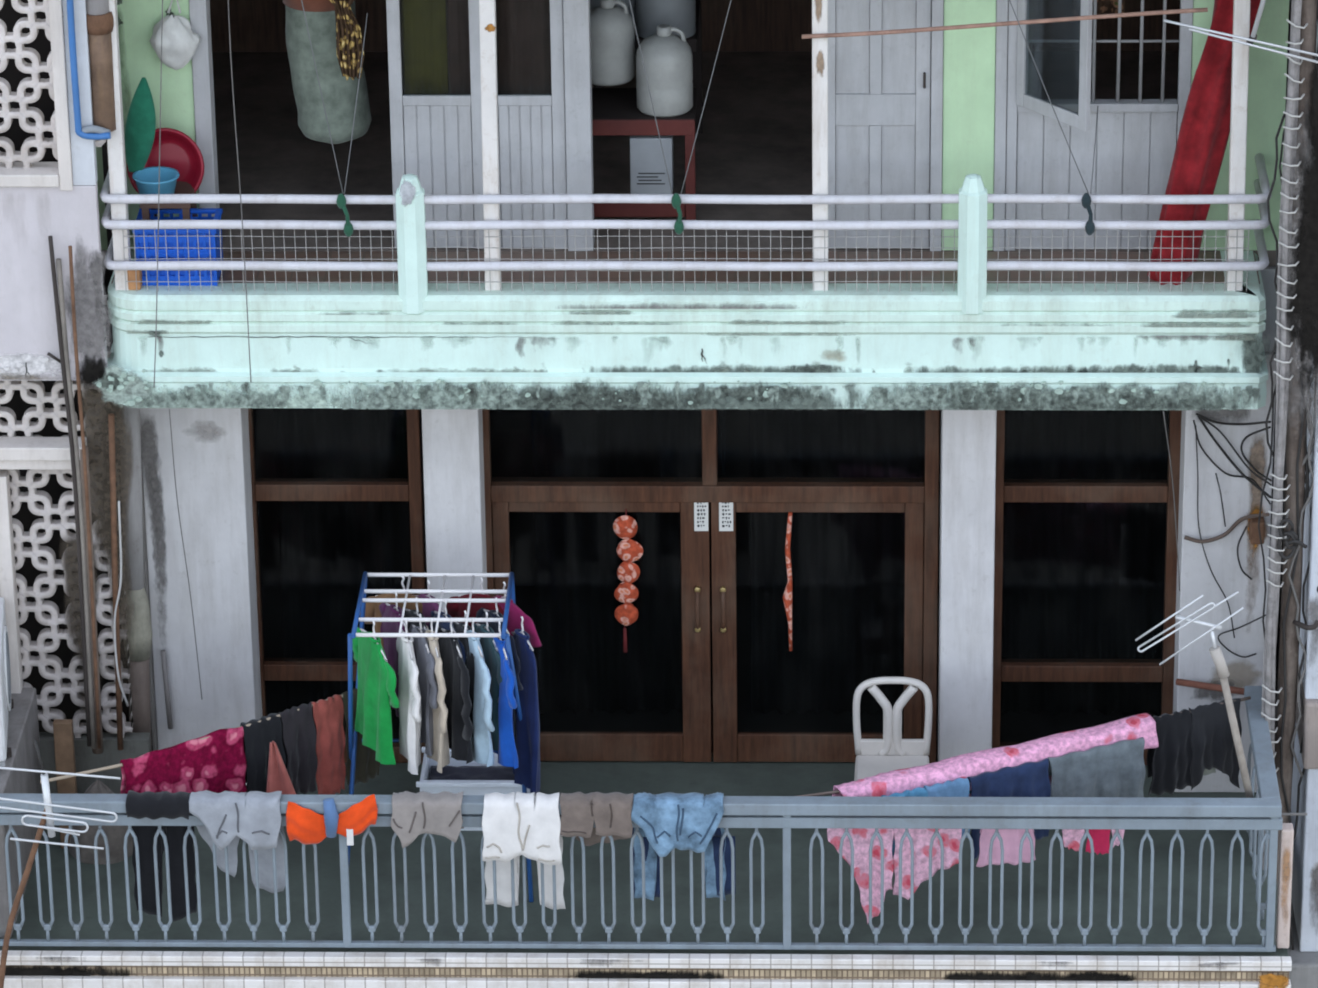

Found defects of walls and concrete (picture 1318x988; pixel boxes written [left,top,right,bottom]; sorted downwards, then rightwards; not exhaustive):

water stain [1286,68,1318,418]
water stain [92,253,108,324]
water stain [563,304,838,336]
water stain [63,310,1268,667]
water stain [1307,601,1318,643]
rust [1259,974,1289,988]